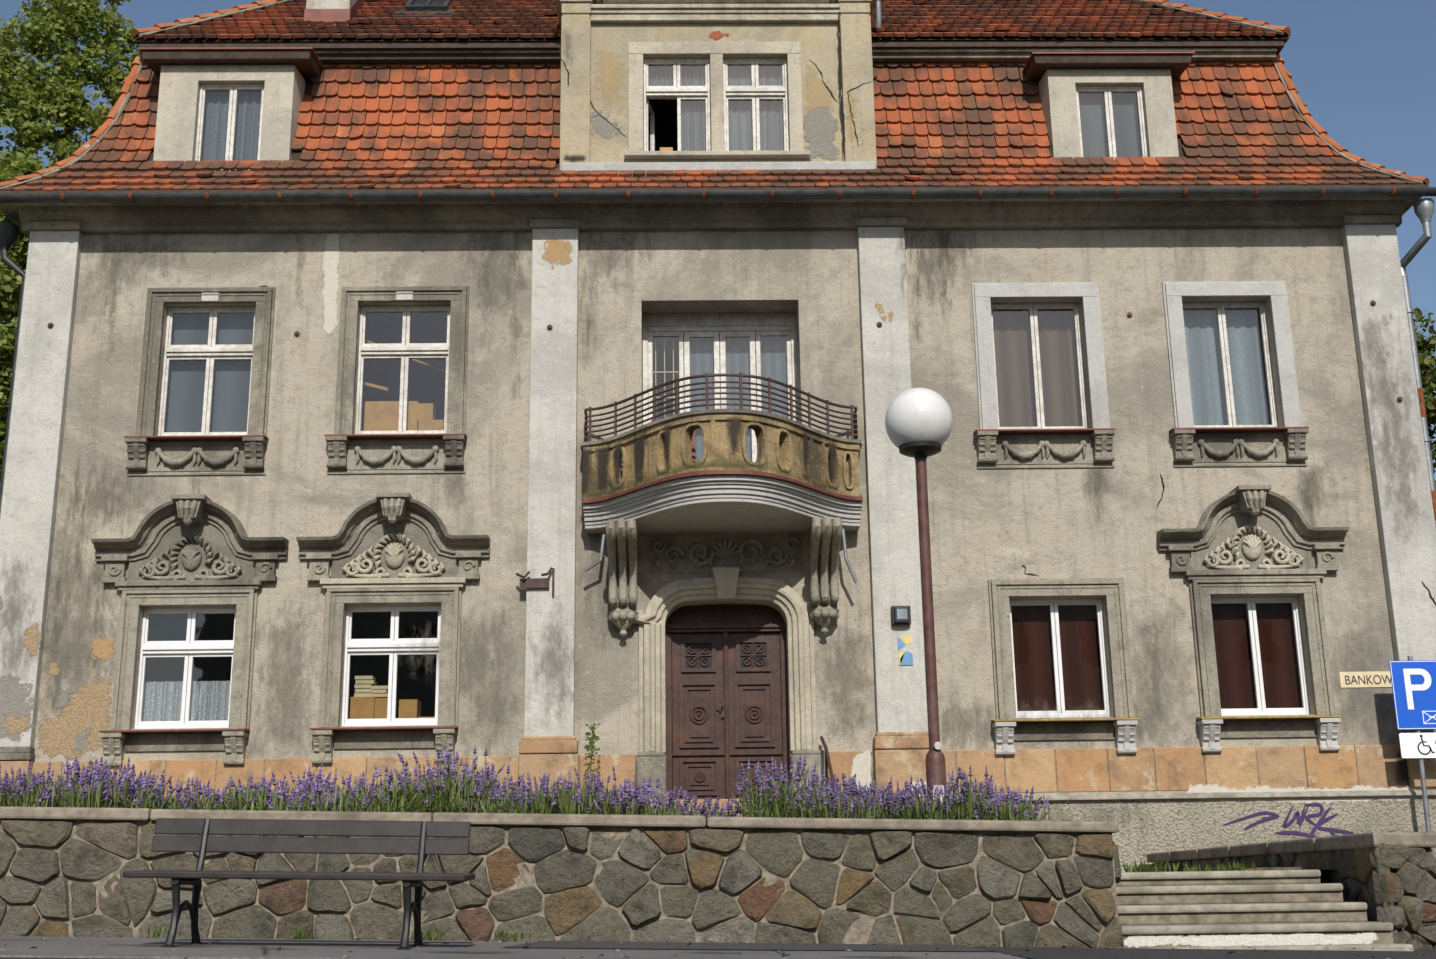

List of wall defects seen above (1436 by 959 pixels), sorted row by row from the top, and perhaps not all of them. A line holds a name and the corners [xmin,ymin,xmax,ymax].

crack [809,13,871,158]
flaking render [541,238,573,270]
flaking render [23,622,42,657]
flaking render [0,635,116,759]